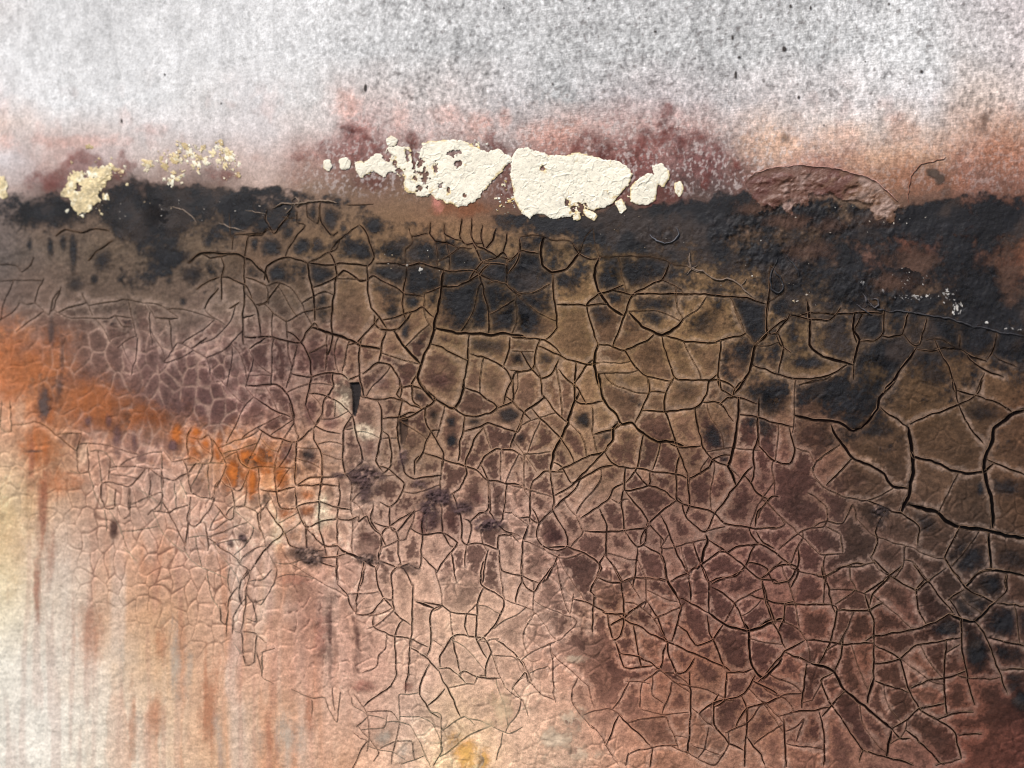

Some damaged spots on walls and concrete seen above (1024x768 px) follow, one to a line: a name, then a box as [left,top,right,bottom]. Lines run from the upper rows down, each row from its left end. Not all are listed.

peeling [323,157,367,176]
peeling [573,209,597,221]
peeling [615,199,627,213]
leakage [0,177,1024,446]
corrosion [171,427,285,494]
crack [0,202,1024,768]
leakage [936,548,1024,669]